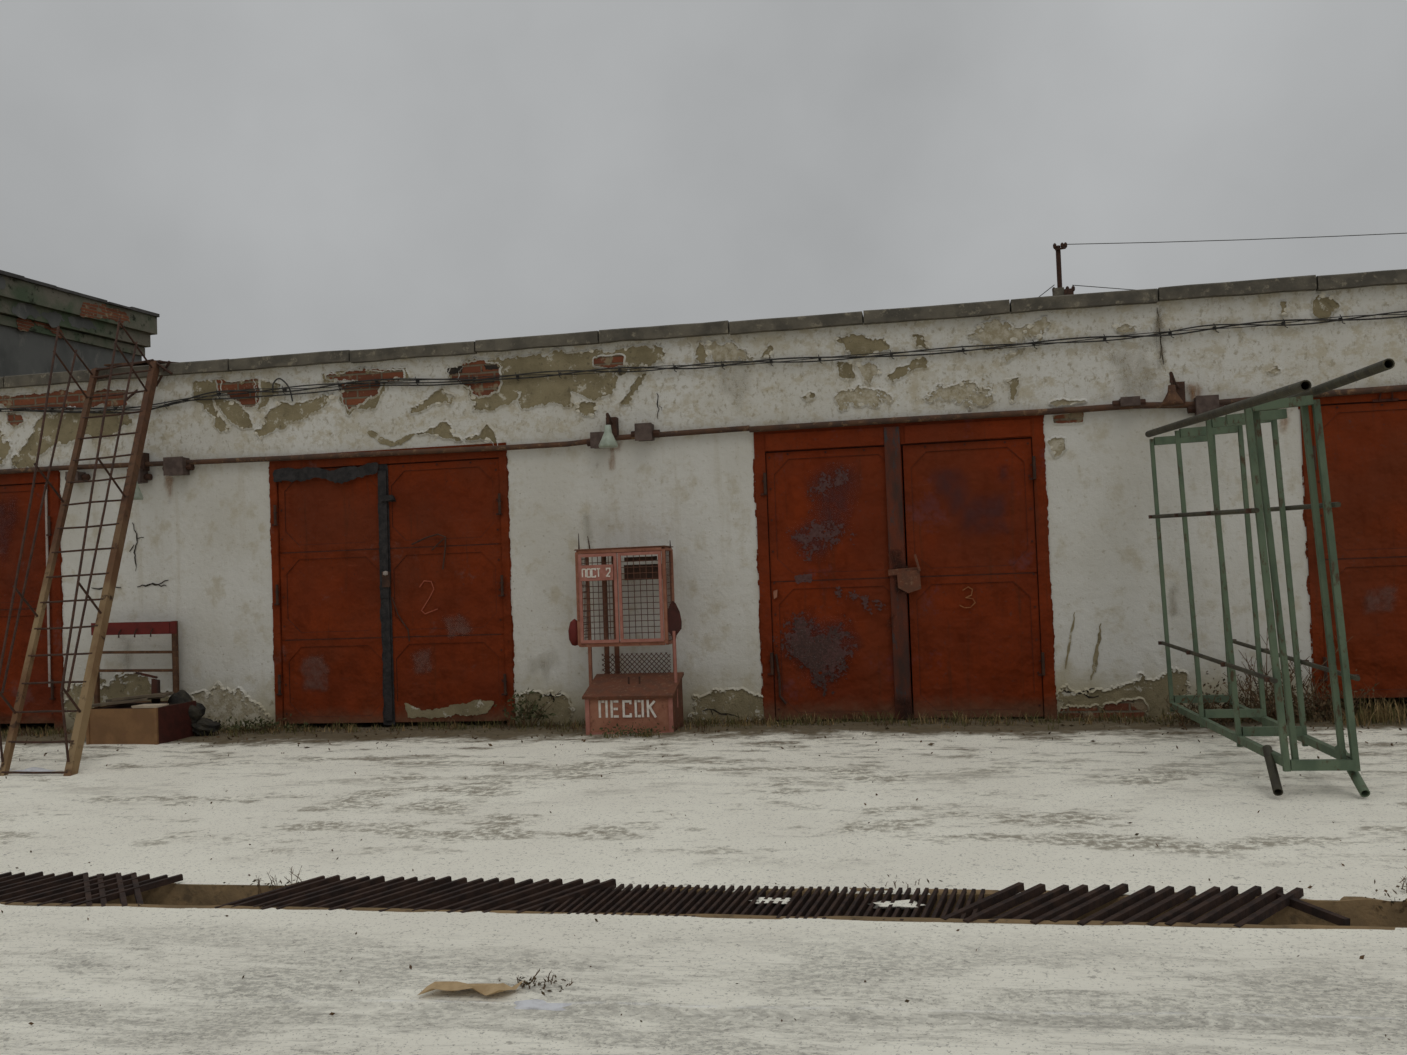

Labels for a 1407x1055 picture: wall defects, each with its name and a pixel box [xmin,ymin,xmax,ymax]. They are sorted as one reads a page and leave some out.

flaking render [0,387,135,469]
flaking render [191,366,411,440]
flaking render [367,343,668,447]
flaking render [693,339,776,367]
flaking render [800,315,1053,414]
flaking render [1045,397,1088,460]
peeling [786,462,856,585]
peeling [772,611,858,683]
peeling [404,699,494,720]
flaking render [516,689,575,726]